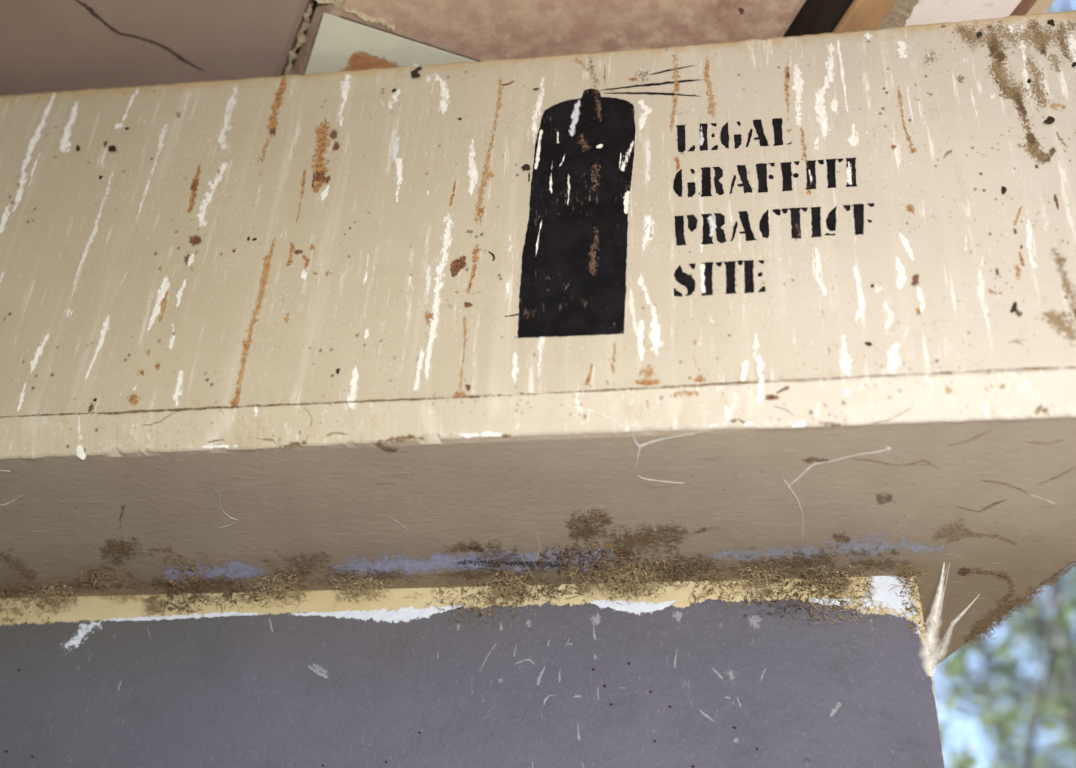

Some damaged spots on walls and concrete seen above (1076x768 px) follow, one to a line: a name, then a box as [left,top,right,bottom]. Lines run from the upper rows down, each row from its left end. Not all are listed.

crack [75,0,206,71]
water stain [985,23,1076,114]
rust [188,163,201,214]
rust [257,76,287,176]
rust [296,118,331,223]
rust [473,76,515,231]
water stain [1023,144,1052,165]
rust [286,243,331,282]
rust [228,237,276,407]
rust [450,245,482,398]